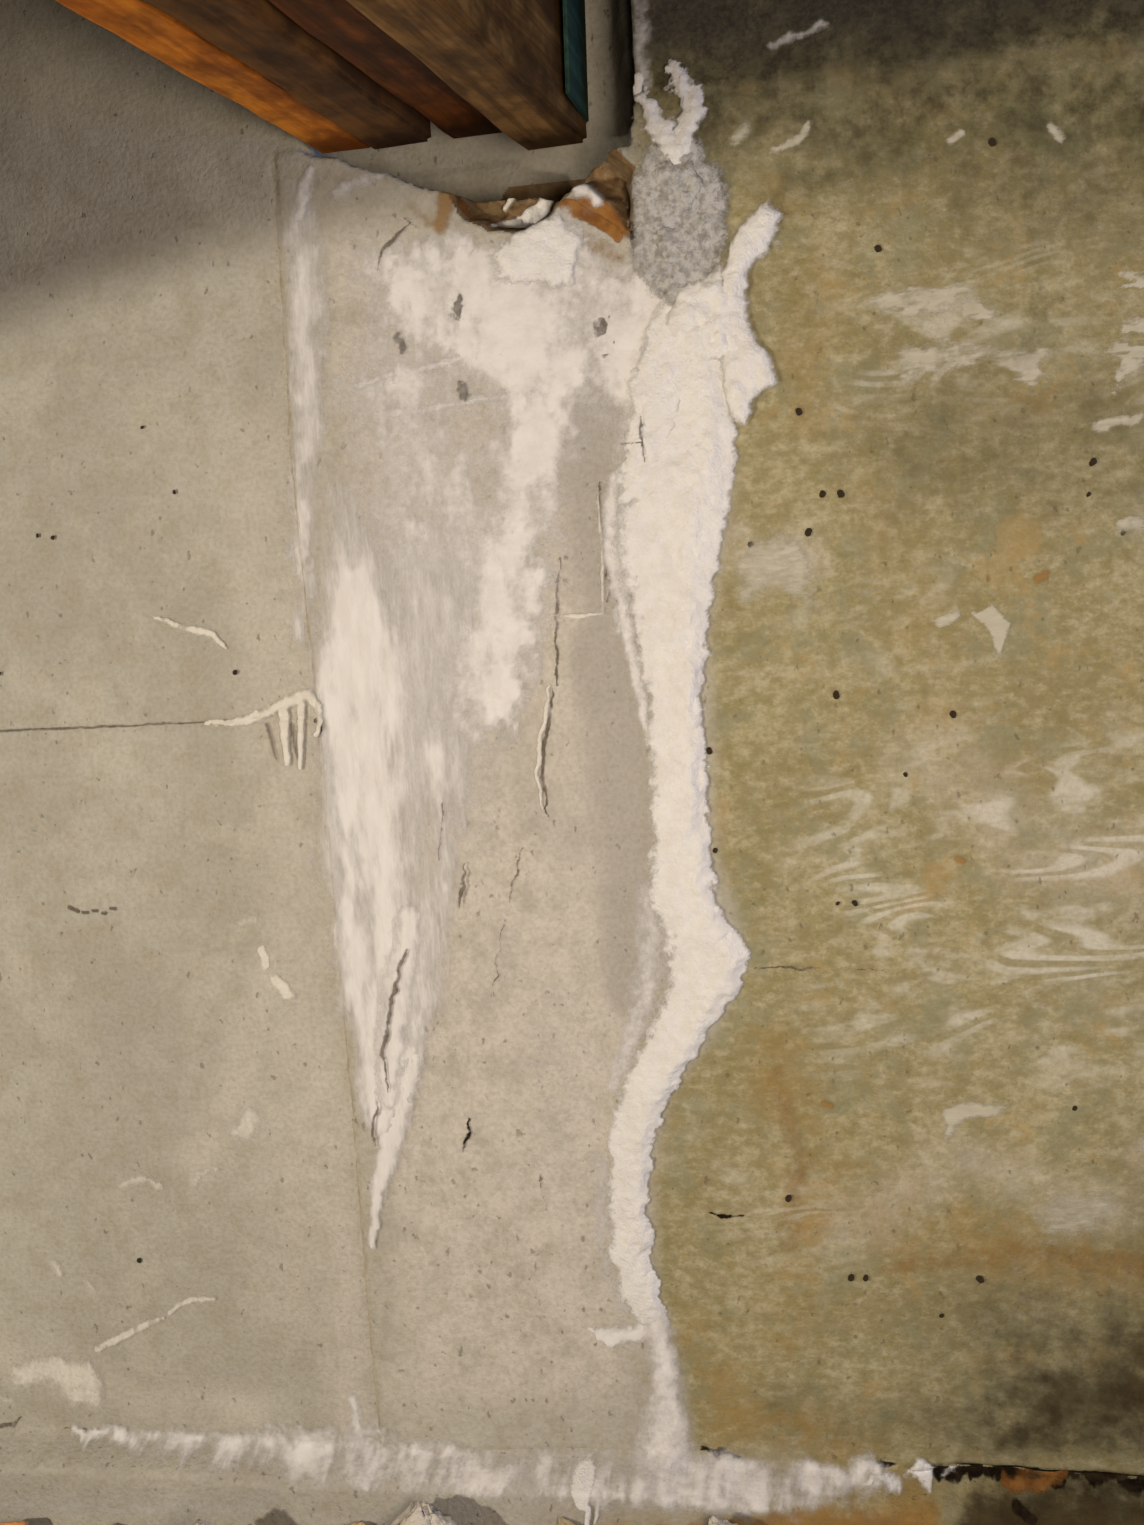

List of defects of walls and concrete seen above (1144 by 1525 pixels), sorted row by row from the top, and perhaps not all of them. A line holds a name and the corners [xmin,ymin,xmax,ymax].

damp [633,59,707,165]
spalling [447,138,728,303]
crack [598,482,610,600]
crack [534,558,561,817]
crack [438,803,466,908]
damp [72,166,954,1525]
crack [371,949,407,1146]
damp [1039,1345,1144,1427]